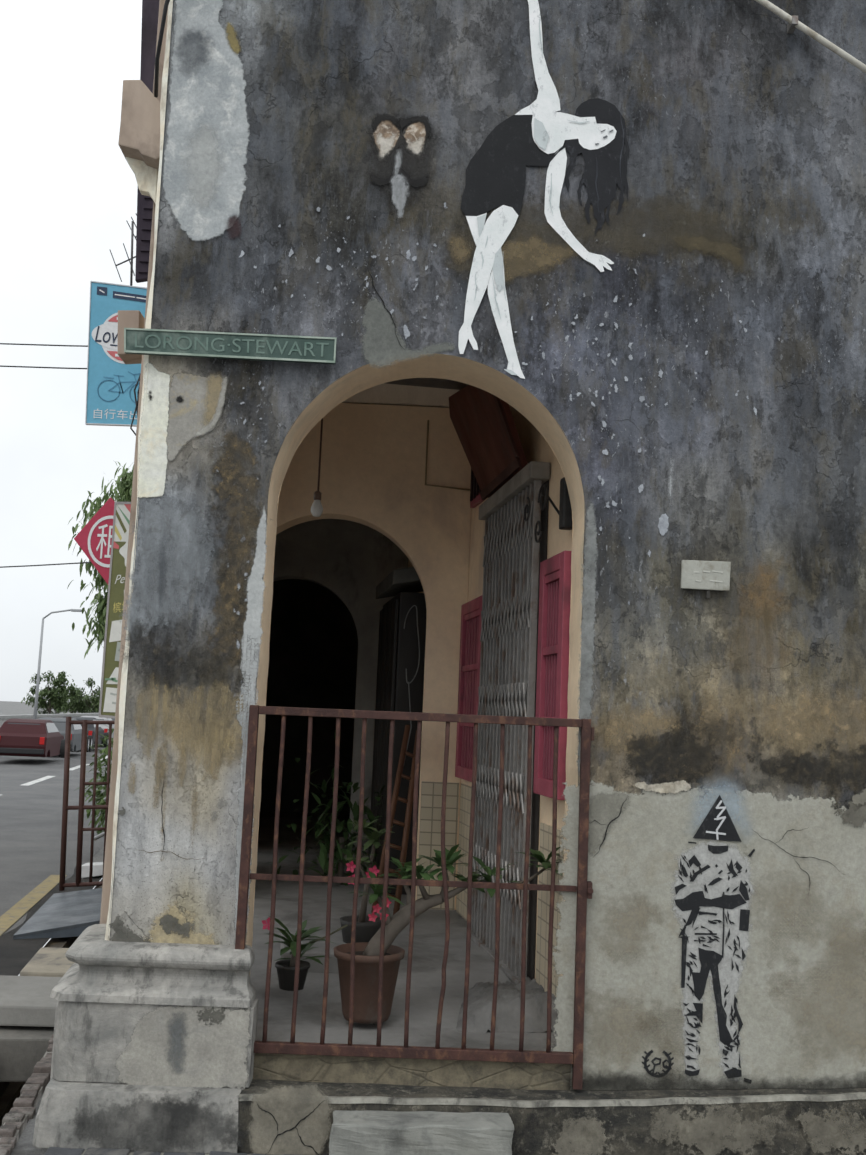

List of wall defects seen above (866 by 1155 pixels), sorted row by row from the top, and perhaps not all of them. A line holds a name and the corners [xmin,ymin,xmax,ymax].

peeling [163,0,250,241]
flaking render [166,372,227,461]
leakage [123,621,249,833]
leakage [606,694,866,797]
crack [143,783,204,860]
spalling [588,780,691,853]
spalling [830,789,866,828]
crack [752,829,845,895]
crack [249,1084,331,1155]